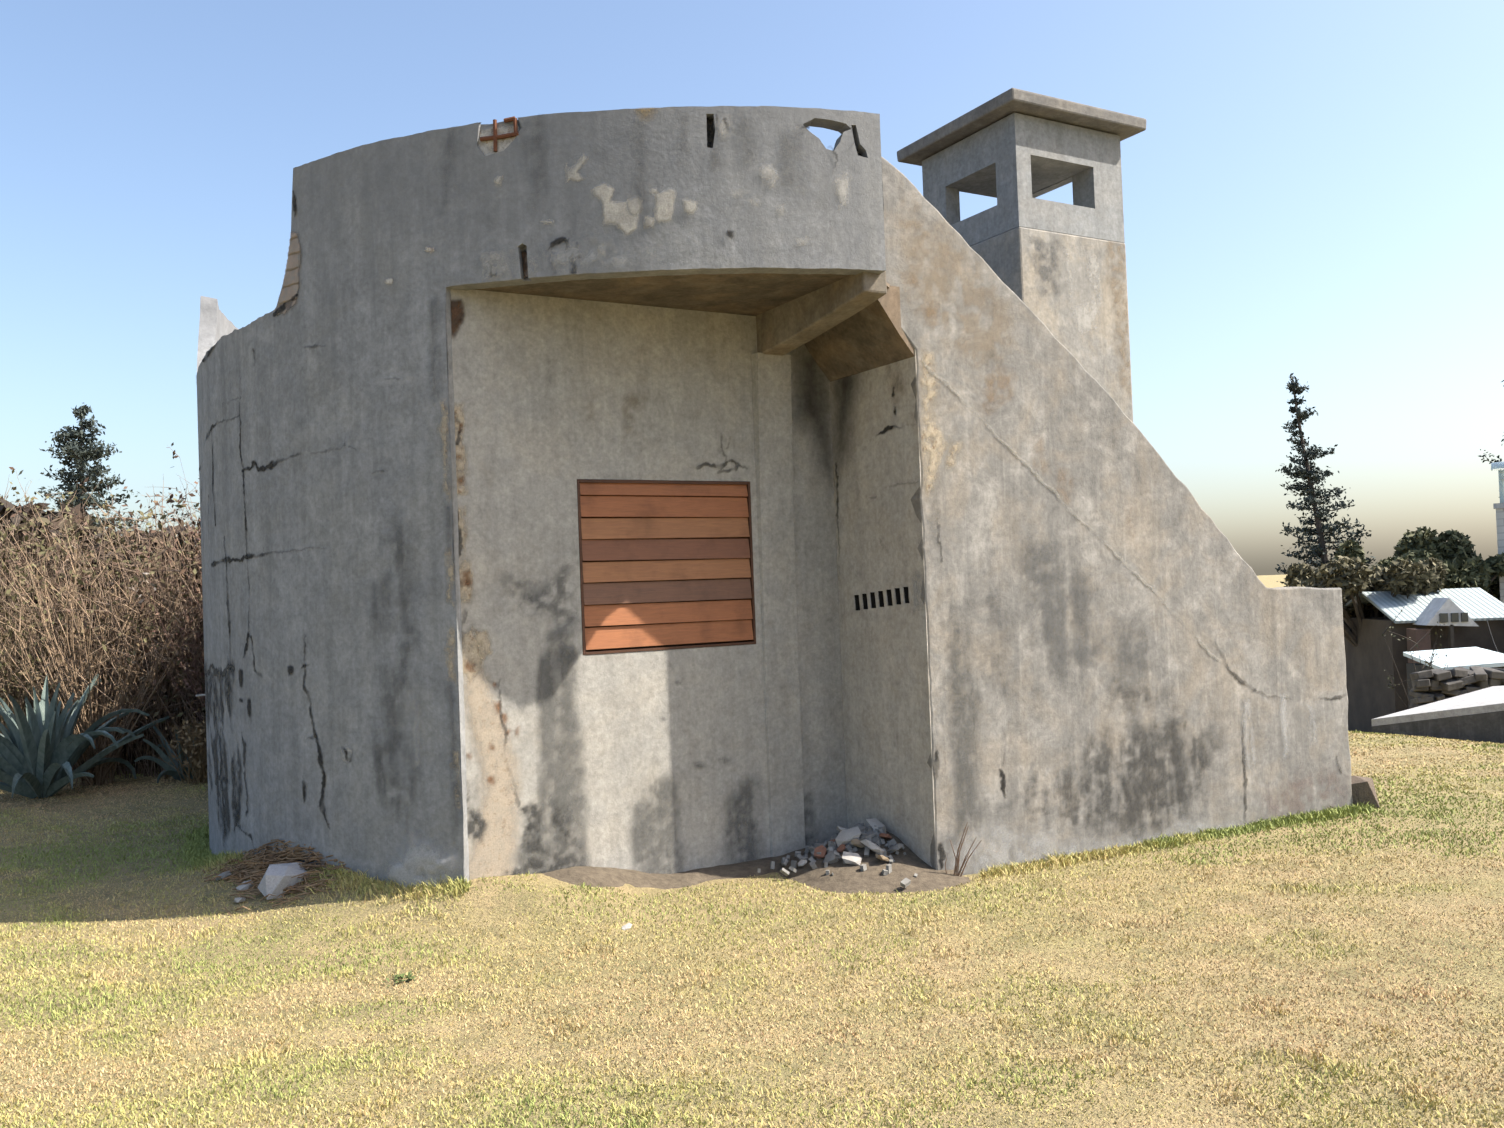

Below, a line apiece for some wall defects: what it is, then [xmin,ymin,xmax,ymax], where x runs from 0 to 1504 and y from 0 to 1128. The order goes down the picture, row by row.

spalling [273,191,301,316]
peeling [567,155,696,234]
crack [199,421,278,672]
leakage [519,577,565,614]
leakage [204,662,252,840]
crack [302,643,329,825]
leakage [513,634,587,875]
leakage [633,779,678,874]
leakage [727,782,755,862]